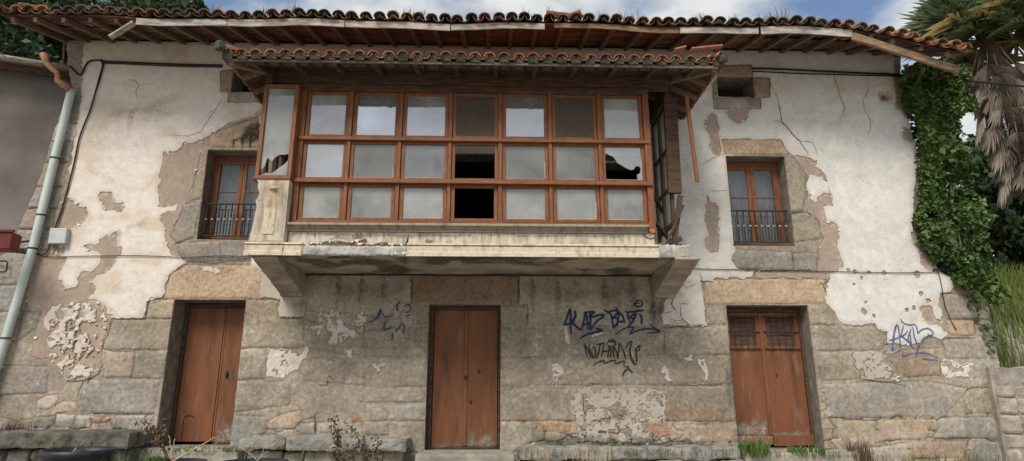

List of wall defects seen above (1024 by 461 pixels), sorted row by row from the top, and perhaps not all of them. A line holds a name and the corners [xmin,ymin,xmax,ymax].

flaking render [703,109,751,156]
crack [764,75,817,155]
flaking render [60,198,88,229]
flaking render [99,192,125,212]
flaking render [158,109,262,254]
flaking render [643,196,720,277]
flaking render [754,155,886,285]
flaking render [24,232,122,359]